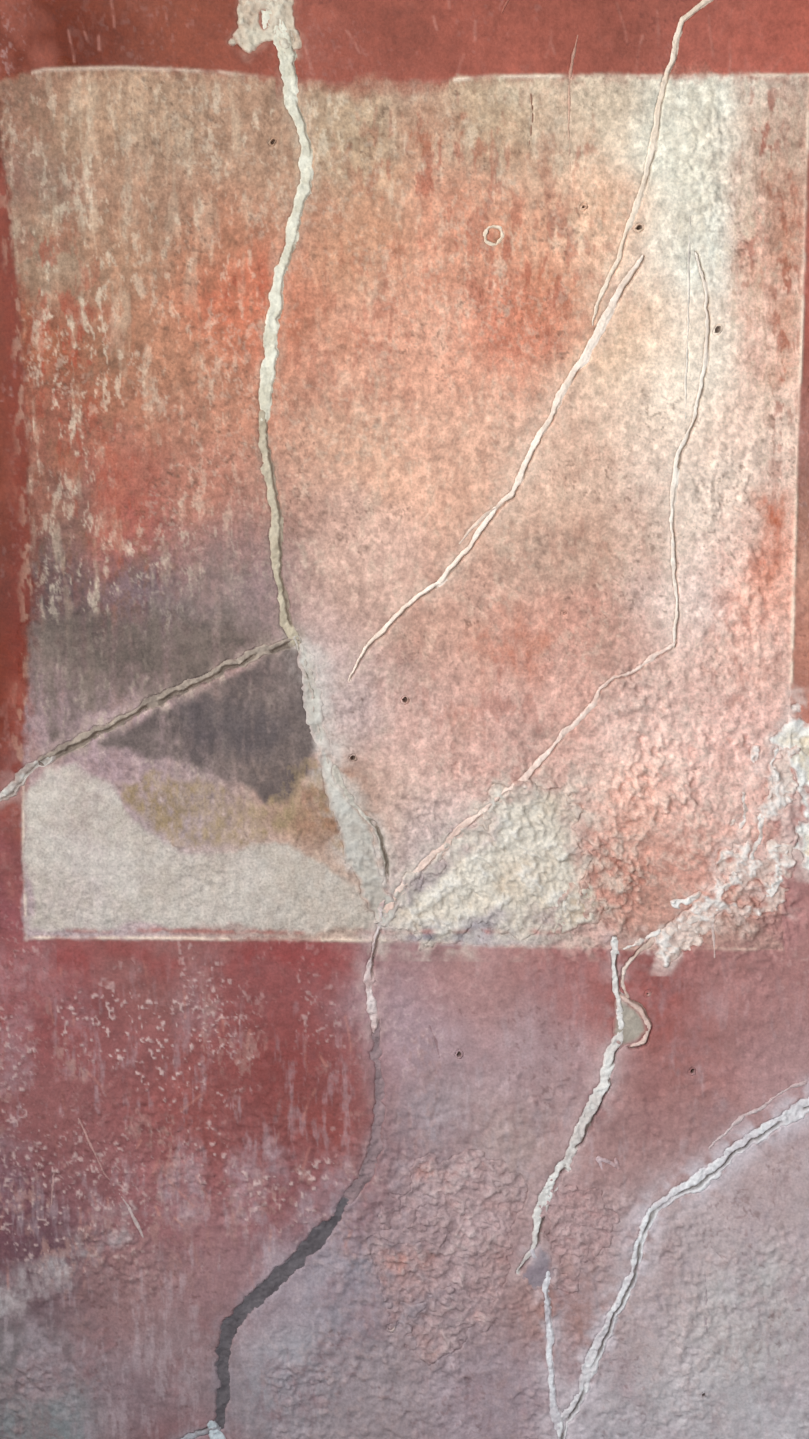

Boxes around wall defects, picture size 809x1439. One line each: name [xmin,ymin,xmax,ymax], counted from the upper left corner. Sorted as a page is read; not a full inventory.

crack [0,0,408,1439]
crack [348,0,713,683]
crack [413,216,710,873]
peeling [623,703,809,968]
crack [516,927,809,1439]